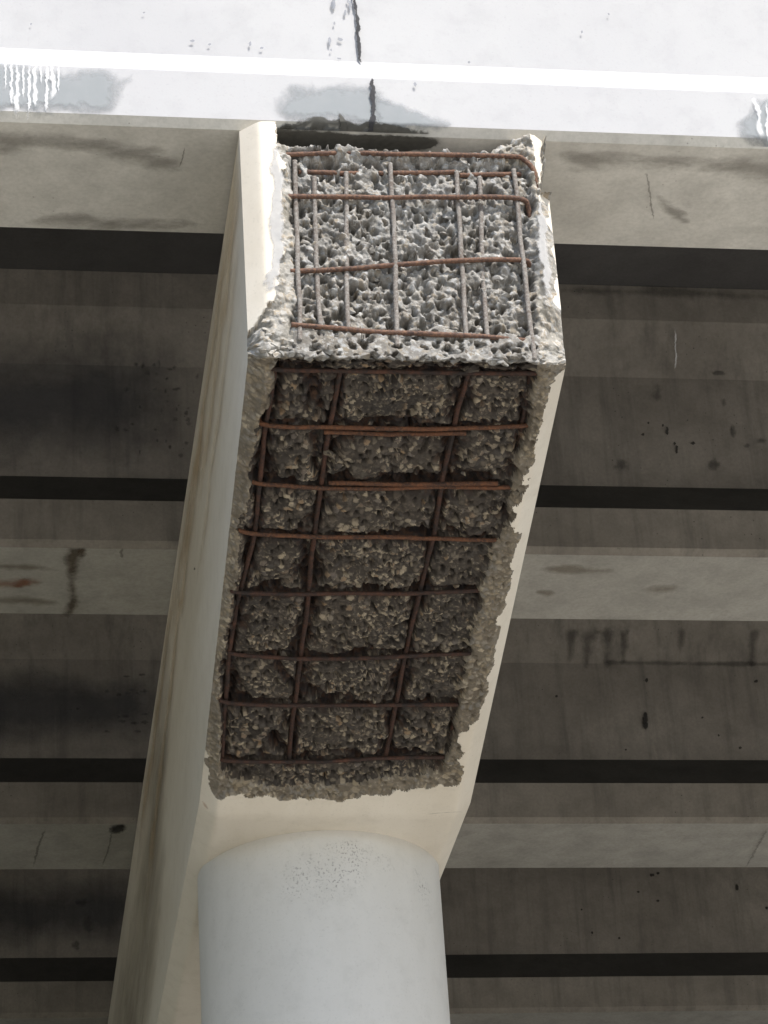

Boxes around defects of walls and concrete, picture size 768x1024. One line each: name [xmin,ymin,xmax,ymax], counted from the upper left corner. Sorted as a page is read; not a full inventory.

leakage [0,65,116,110]
crack [353,0,376,131]
spalling [204,87,566,802]
leakage [67,549,84,614]